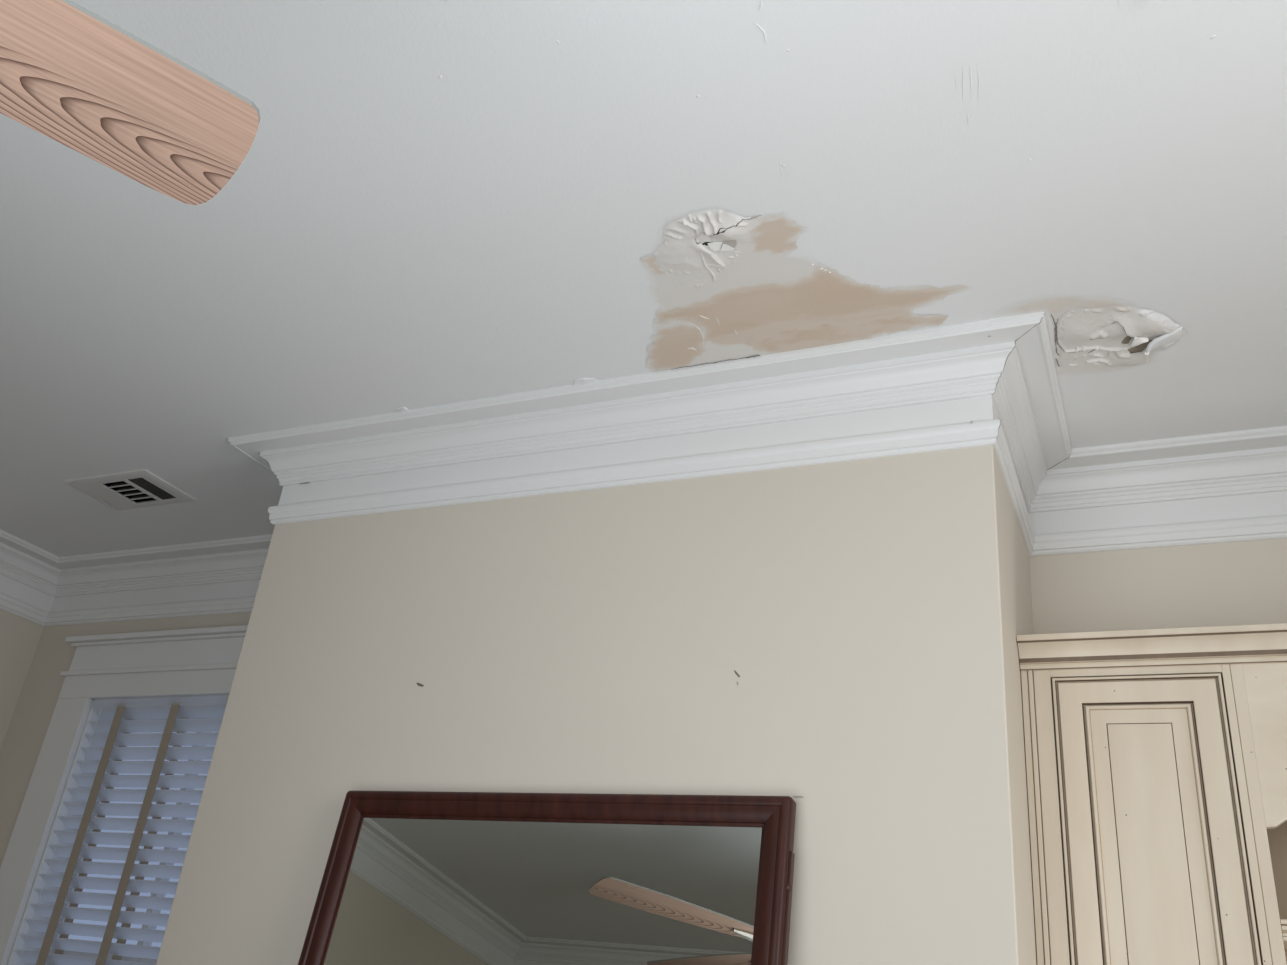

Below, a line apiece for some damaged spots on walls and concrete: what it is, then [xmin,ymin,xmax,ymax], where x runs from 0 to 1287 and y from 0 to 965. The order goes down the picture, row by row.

peeling [652,208,764,290]
peeling [1056,305,1189,370]